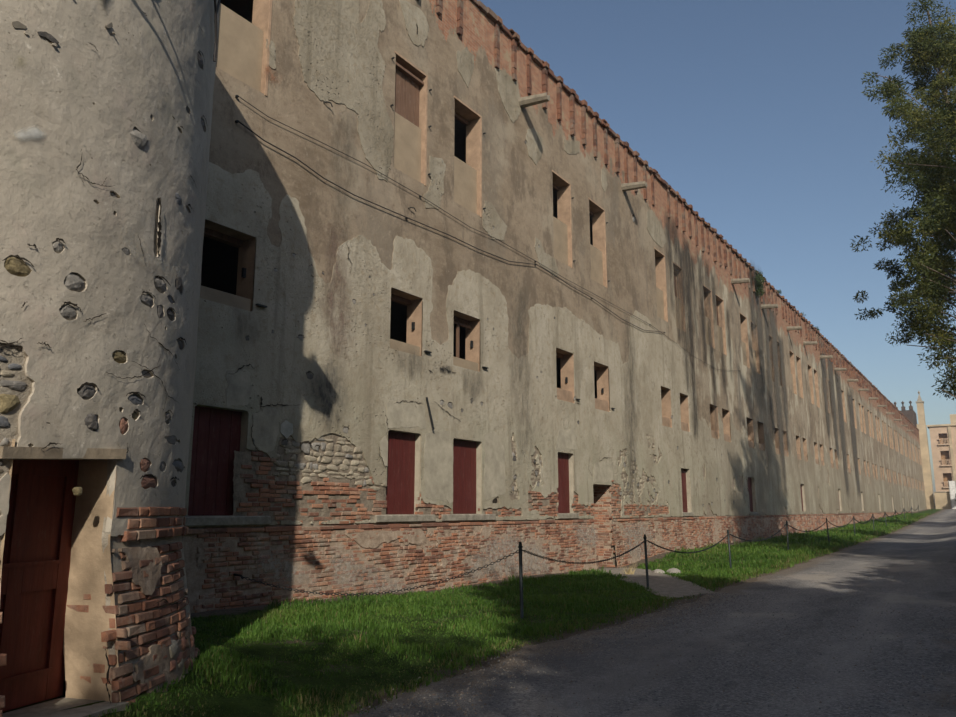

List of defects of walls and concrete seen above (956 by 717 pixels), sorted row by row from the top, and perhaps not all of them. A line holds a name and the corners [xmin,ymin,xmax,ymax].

crack [76,149,114,187]
crack [106,324,180,410]
flaking render [140,156,927,526]
spalling [0,380,27,446]
crack [251,397,296,451]